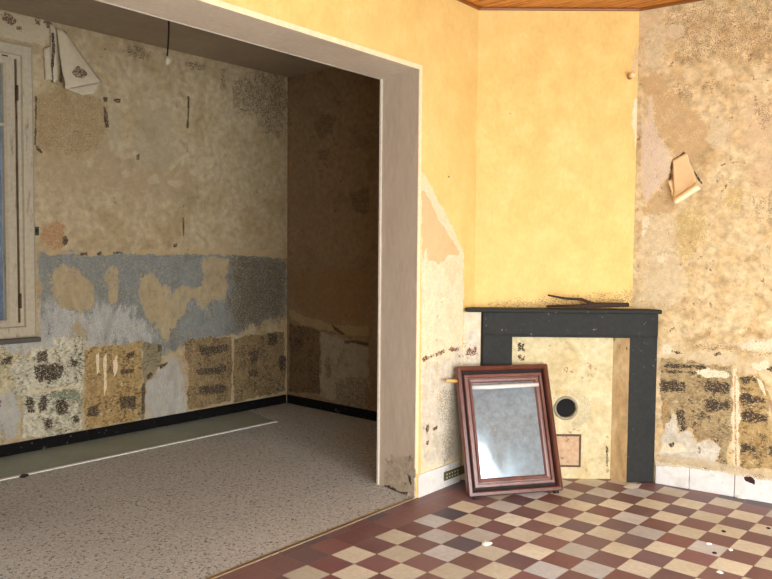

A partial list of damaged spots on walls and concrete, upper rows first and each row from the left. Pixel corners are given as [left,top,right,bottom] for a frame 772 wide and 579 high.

peeling [43,24,102,95]
spalling [103,97,122,150]
spalling [318,332,371,410]
spalling [660,344,772,379]
spalling [654,416,772,484]